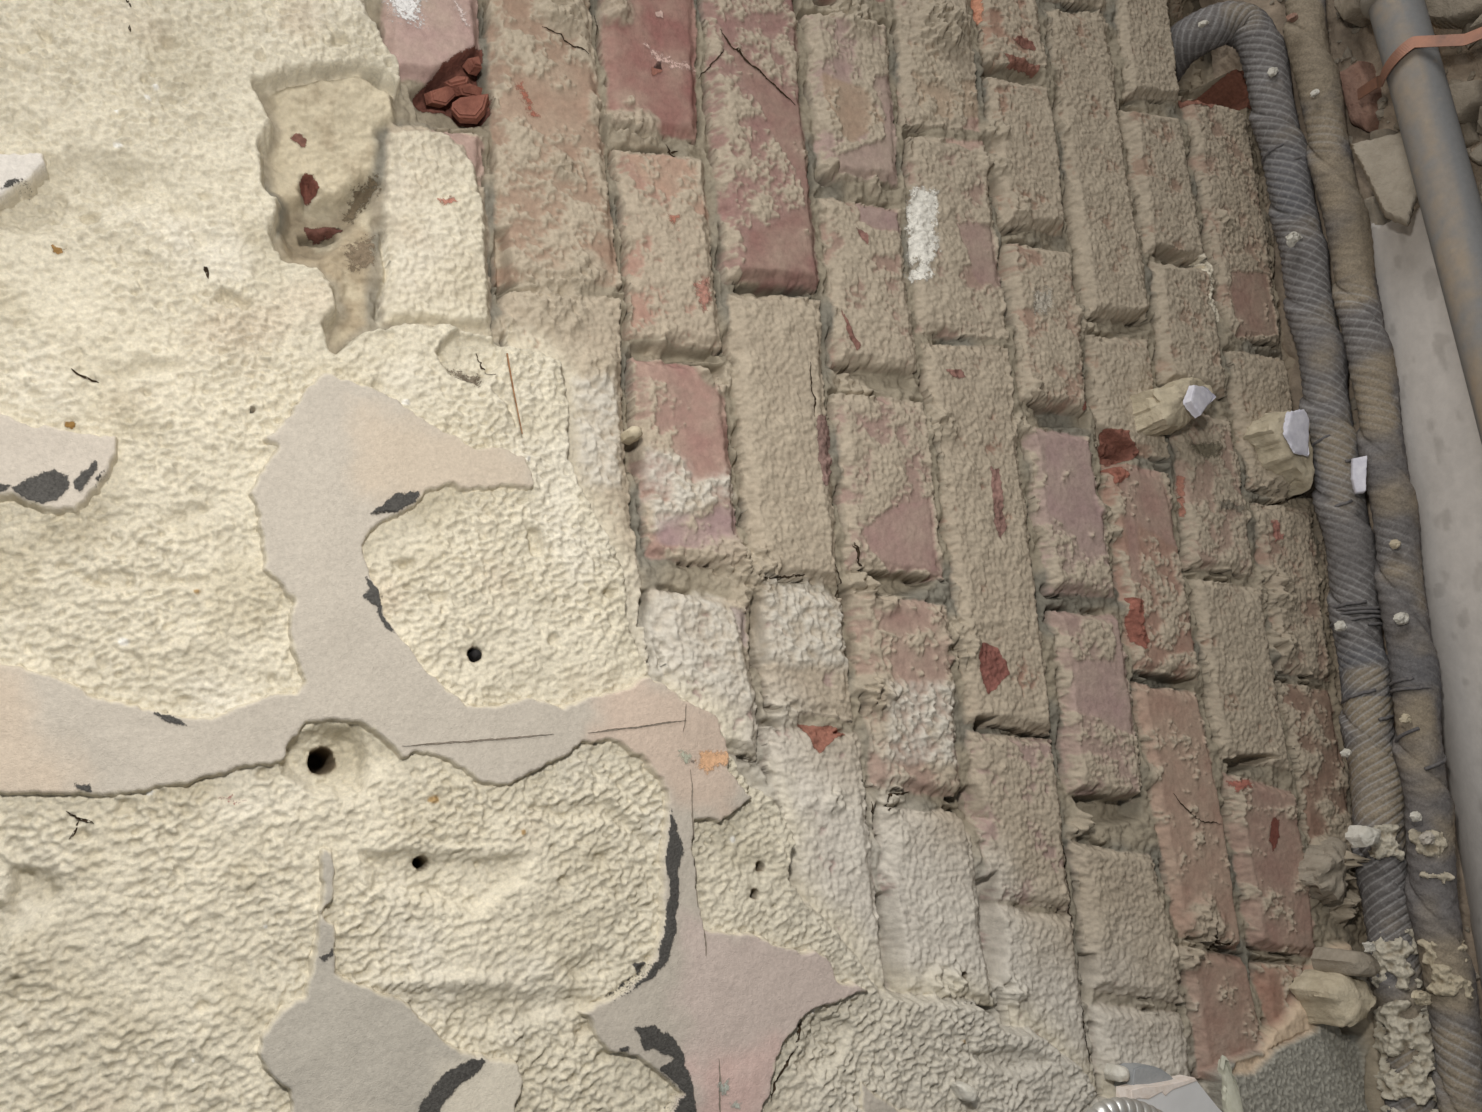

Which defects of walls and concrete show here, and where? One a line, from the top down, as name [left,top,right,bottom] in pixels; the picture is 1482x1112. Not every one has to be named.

leakage [382,0,425,29]
crack [699,29,795,105]
flaking render [0,153,50,213]
leakage [903,186,941,283]
flaking render [257,0,1371,1112]
flaking render [0,373,868,1112]
flaking render [1339,976,1385,1112]